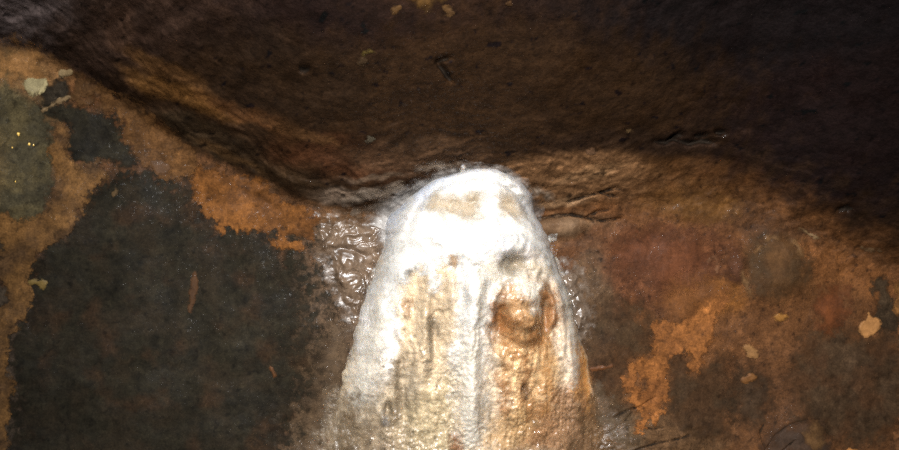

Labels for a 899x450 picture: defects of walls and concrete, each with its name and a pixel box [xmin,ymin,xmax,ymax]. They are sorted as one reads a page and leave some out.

corrosion [0,38,43,84]
damp [294,163,627,450]